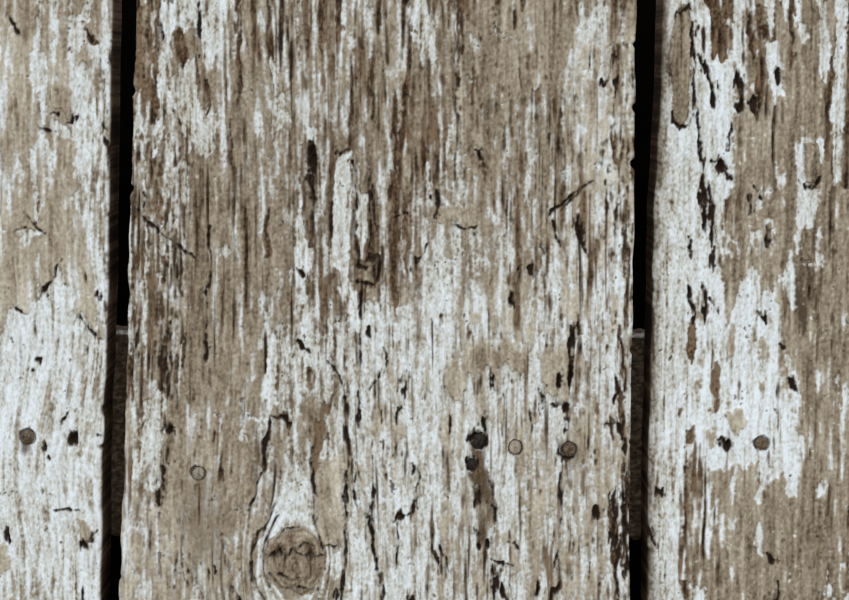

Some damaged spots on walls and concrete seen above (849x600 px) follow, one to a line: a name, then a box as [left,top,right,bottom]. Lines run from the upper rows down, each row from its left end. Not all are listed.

peeling [363,0,374,59]
peeling [401,0,438,74]
peeling [573,0,609,95]
peeling [133,0,234,206]
peeling [258,57,291,143]
peeling [307,126,317,142]
peeling [445,124,454,159]
peeling [0,0,110,600]
peeling [129,221,167,346]
peeling [649,0,849,600]
peeling [245,150,631,600]
peeling [131,389,167,493]